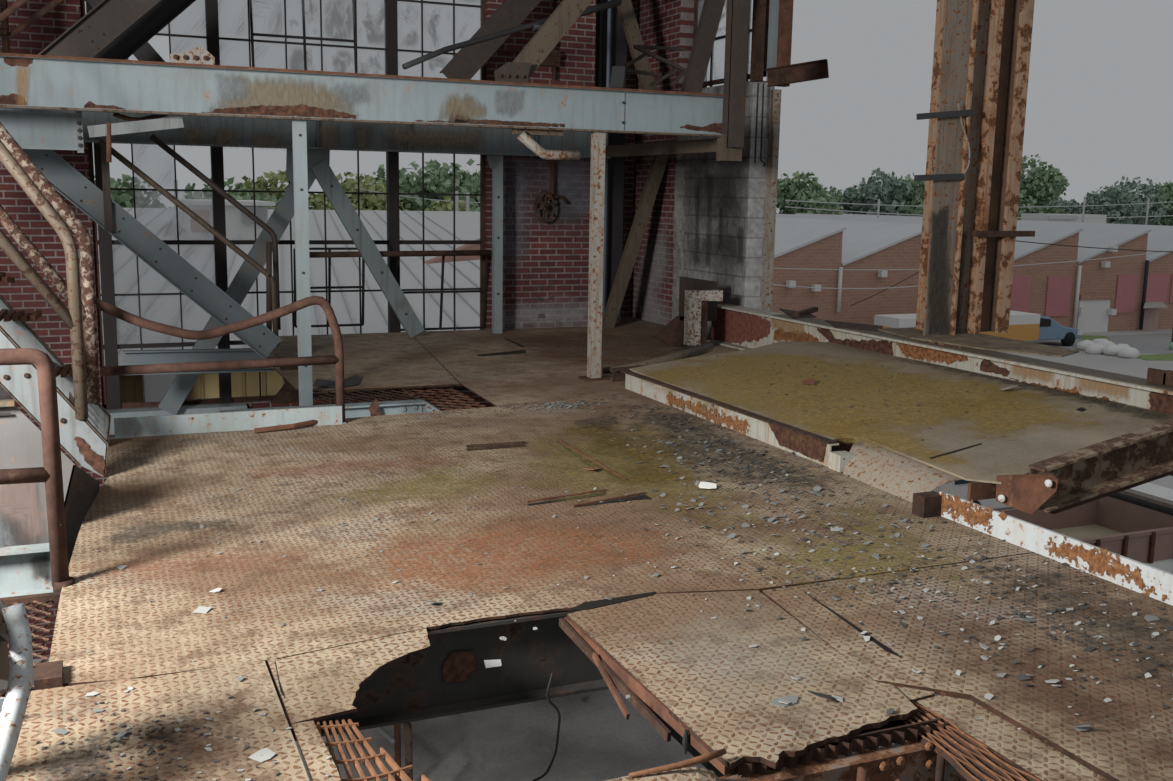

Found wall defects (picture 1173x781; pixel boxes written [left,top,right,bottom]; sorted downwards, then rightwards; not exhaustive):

rust [0,53,725,105]
rust [666,392,750,435]
rust [936,486,1007,534]
rust [1042,533,1168,602]
peeling [484,659,502,668]